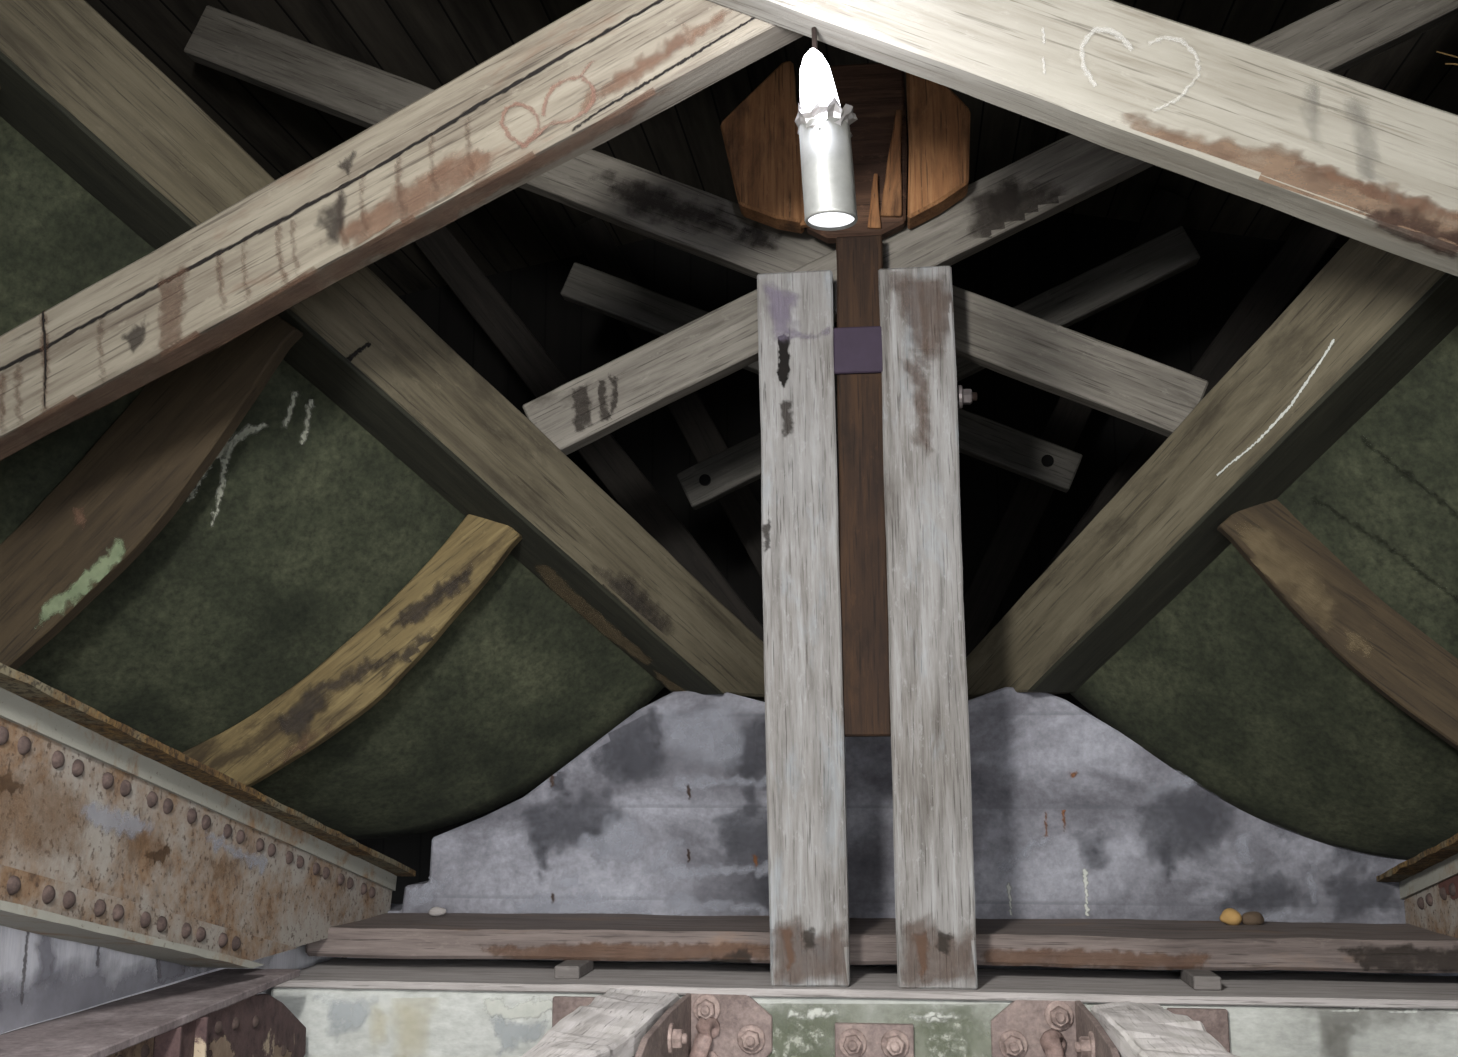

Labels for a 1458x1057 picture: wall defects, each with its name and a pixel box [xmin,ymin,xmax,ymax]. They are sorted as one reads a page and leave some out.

water stain [600,712,662,775]
corrosion [0,771,24,795]
corrosion [146,845,170,865]
water stain [529,775,620,868]
water stain [723,722,769,899]
water stain [1083,840,1101,916]
water stain [1147,793,1217,871]
water stain [1327,880,1391,912]
corrosion [1430,875,1458,900]